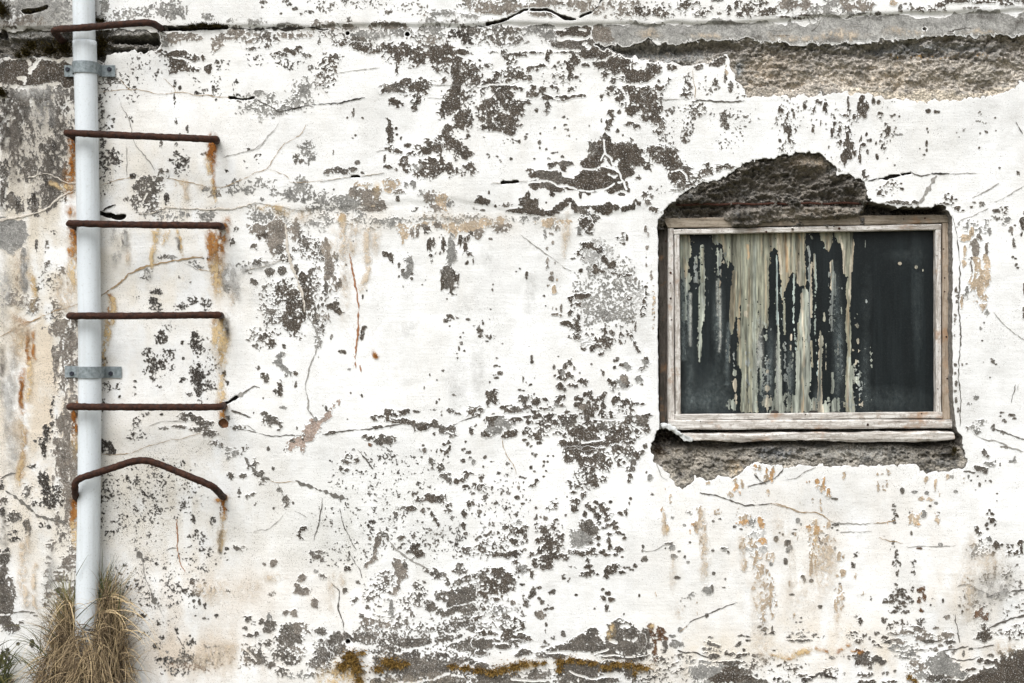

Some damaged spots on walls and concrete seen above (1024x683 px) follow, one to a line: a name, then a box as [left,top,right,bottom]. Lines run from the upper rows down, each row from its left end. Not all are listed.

crack [478,0,602,27]
rust [206,134,217,202]
rust [206,219,229,292]
crack [101,78,400,469]
peeling [0,0,78,683]
rust [212,319,229,419]
peeling [443,308,503,359]
peeling [660,488,690,563]
damp [698,509,708,576]
crack [700,467,944,548]
peeling [907,478,940,536]
peeling [593,588,616,612]